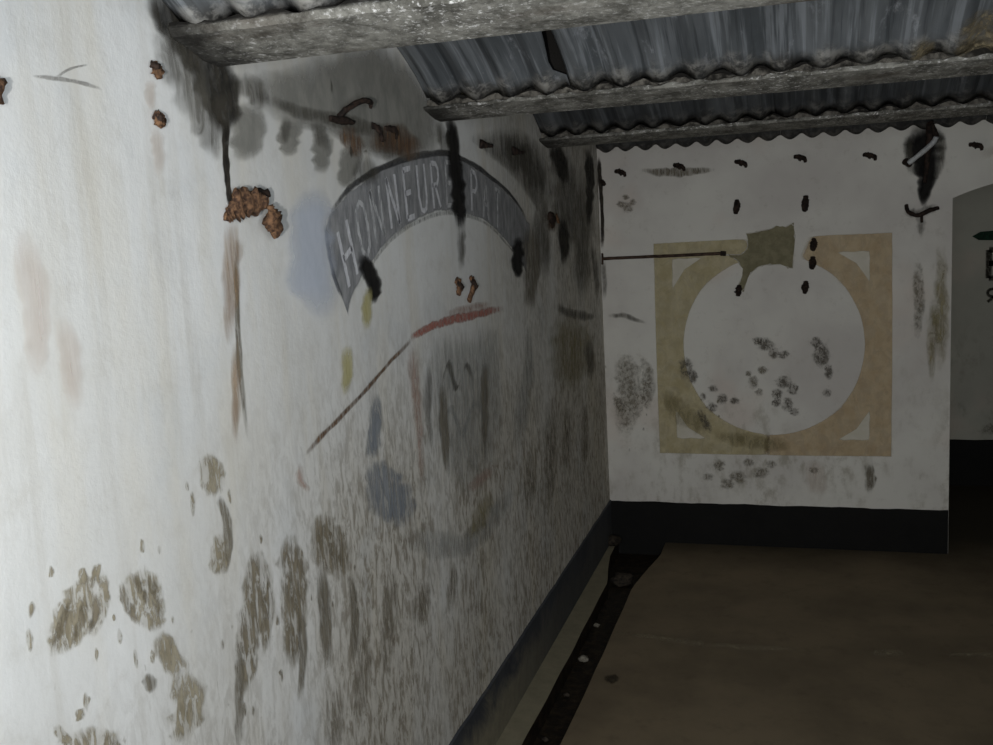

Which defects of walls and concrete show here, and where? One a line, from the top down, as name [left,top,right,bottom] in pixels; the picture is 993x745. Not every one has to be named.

mould [754,339,787,358]
leakage [813,337,832,377]
leakage [614,363,652,425]
mould [746,367,798,414]